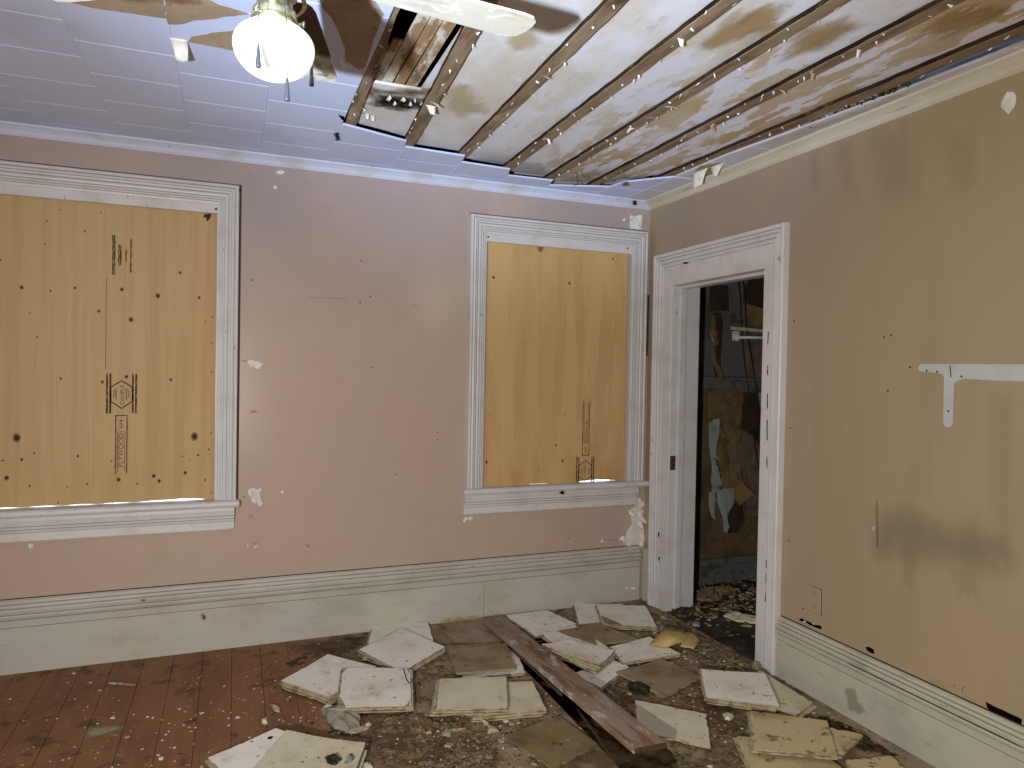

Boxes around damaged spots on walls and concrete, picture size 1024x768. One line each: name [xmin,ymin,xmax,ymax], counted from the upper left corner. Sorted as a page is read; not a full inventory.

damp [704,9,776,48]
damp [793,21,851,55]
damp [929,9,1002,33]
peeling [1001,92,1016,114]
peeling [691,162,725,188]
peeling [247,488,263,517]
peeling [619,498,646,550]